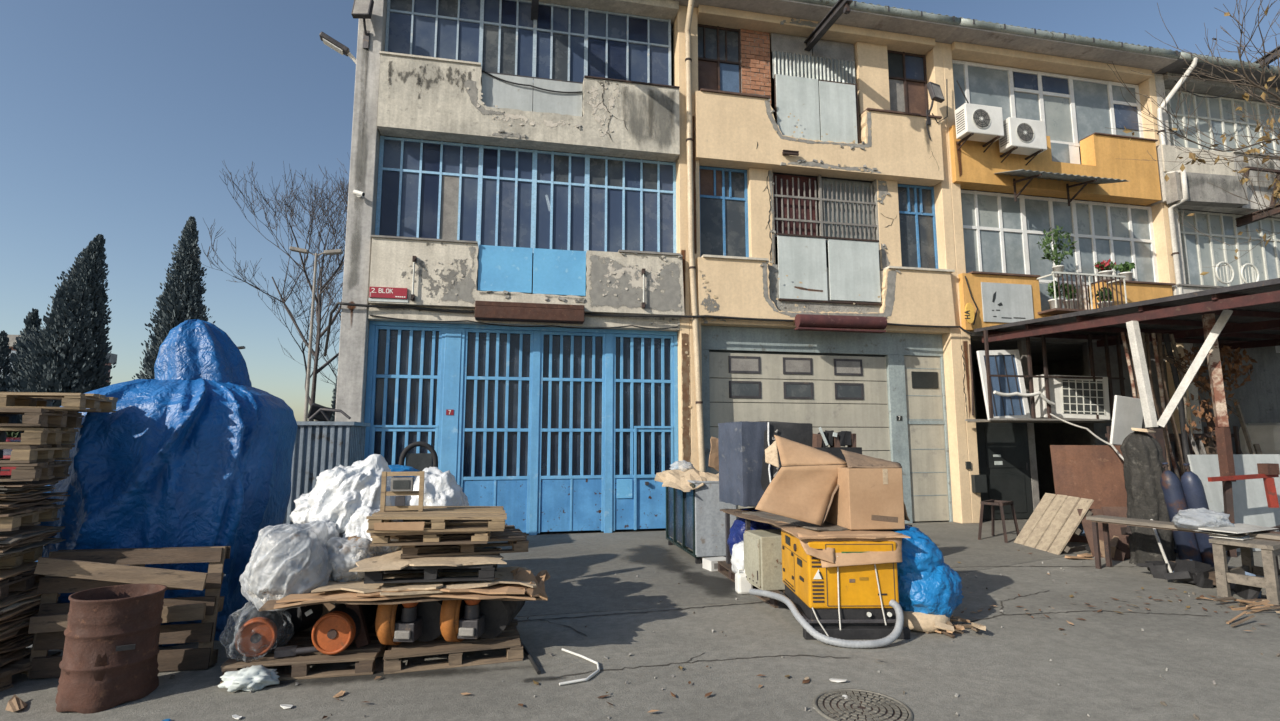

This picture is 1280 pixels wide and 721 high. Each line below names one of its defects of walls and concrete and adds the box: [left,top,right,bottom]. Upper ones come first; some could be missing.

peeling [402,246,510,303]
peeling [545,253,692,469]
leakage [630,90,673,144]
flaking render [760,99,901,318]